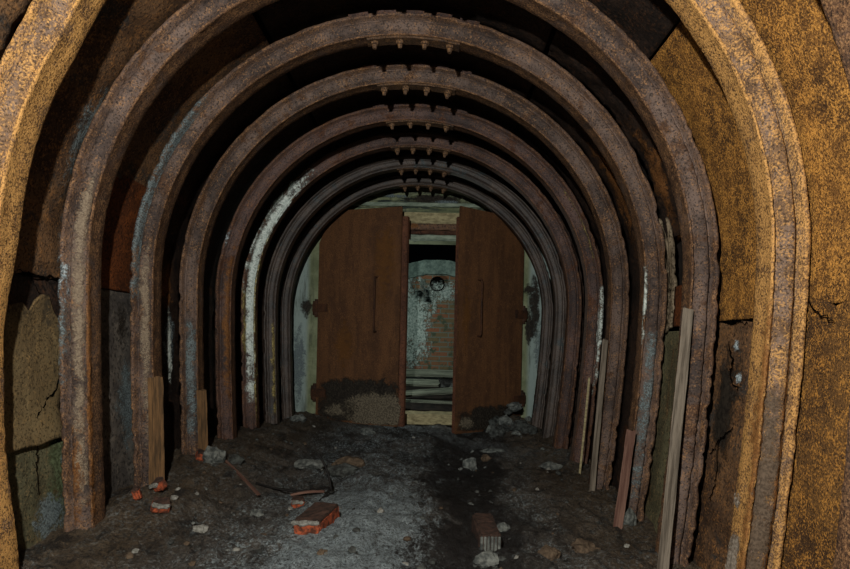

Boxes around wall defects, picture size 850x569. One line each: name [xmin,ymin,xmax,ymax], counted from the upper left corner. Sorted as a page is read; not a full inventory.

water stain [242,169,313,411]
water stain [523,276,541,367]
crack [806,299,834,322]
crack [37,378,59,418]